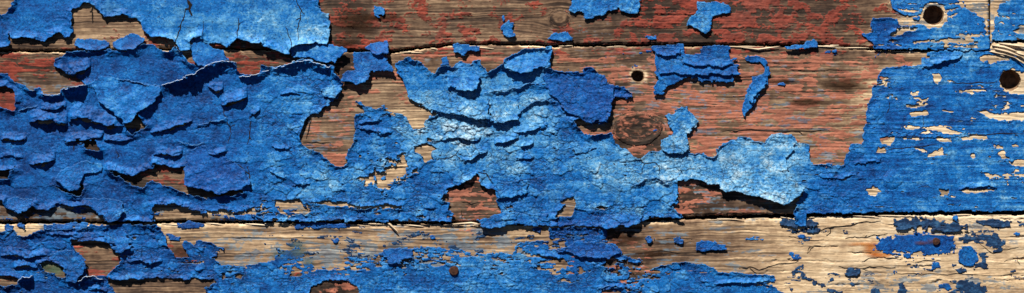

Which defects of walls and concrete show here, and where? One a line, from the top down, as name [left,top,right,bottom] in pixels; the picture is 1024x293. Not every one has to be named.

peeling [0,0,228,179]
peeling [109,0,1024,199]
peeling [0,100,576,293]
peeling [589,177,1024,293]
rust [854,243,890,257]